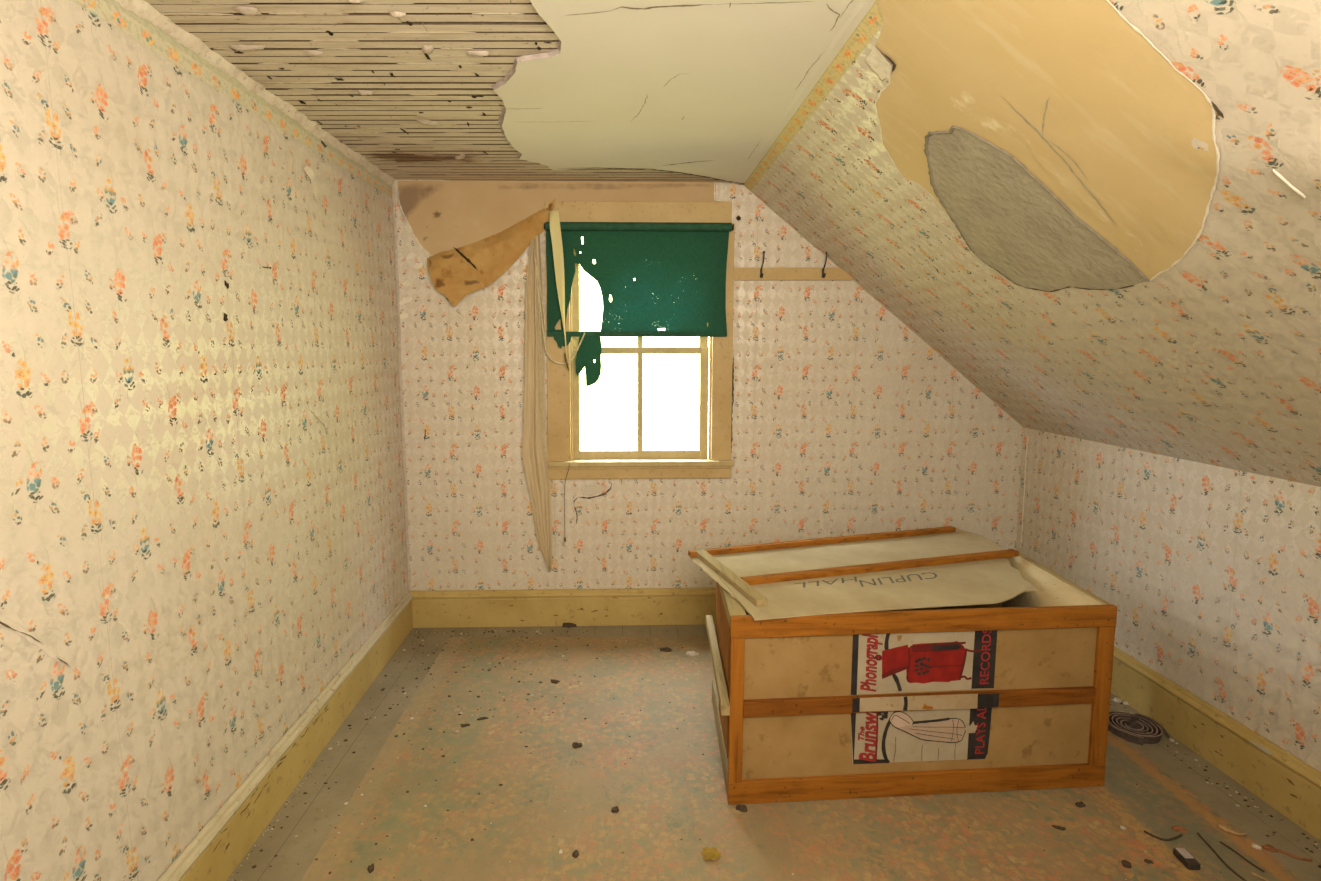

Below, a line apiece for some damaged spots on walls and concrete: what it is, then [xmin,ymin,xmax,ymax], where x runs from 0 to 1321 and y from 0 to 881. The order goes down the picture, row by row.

flaking render [115,0,741,370]
crack [574,0,853,89]
flaking render [865,0,1224,292]
crack [0,615,71,668]